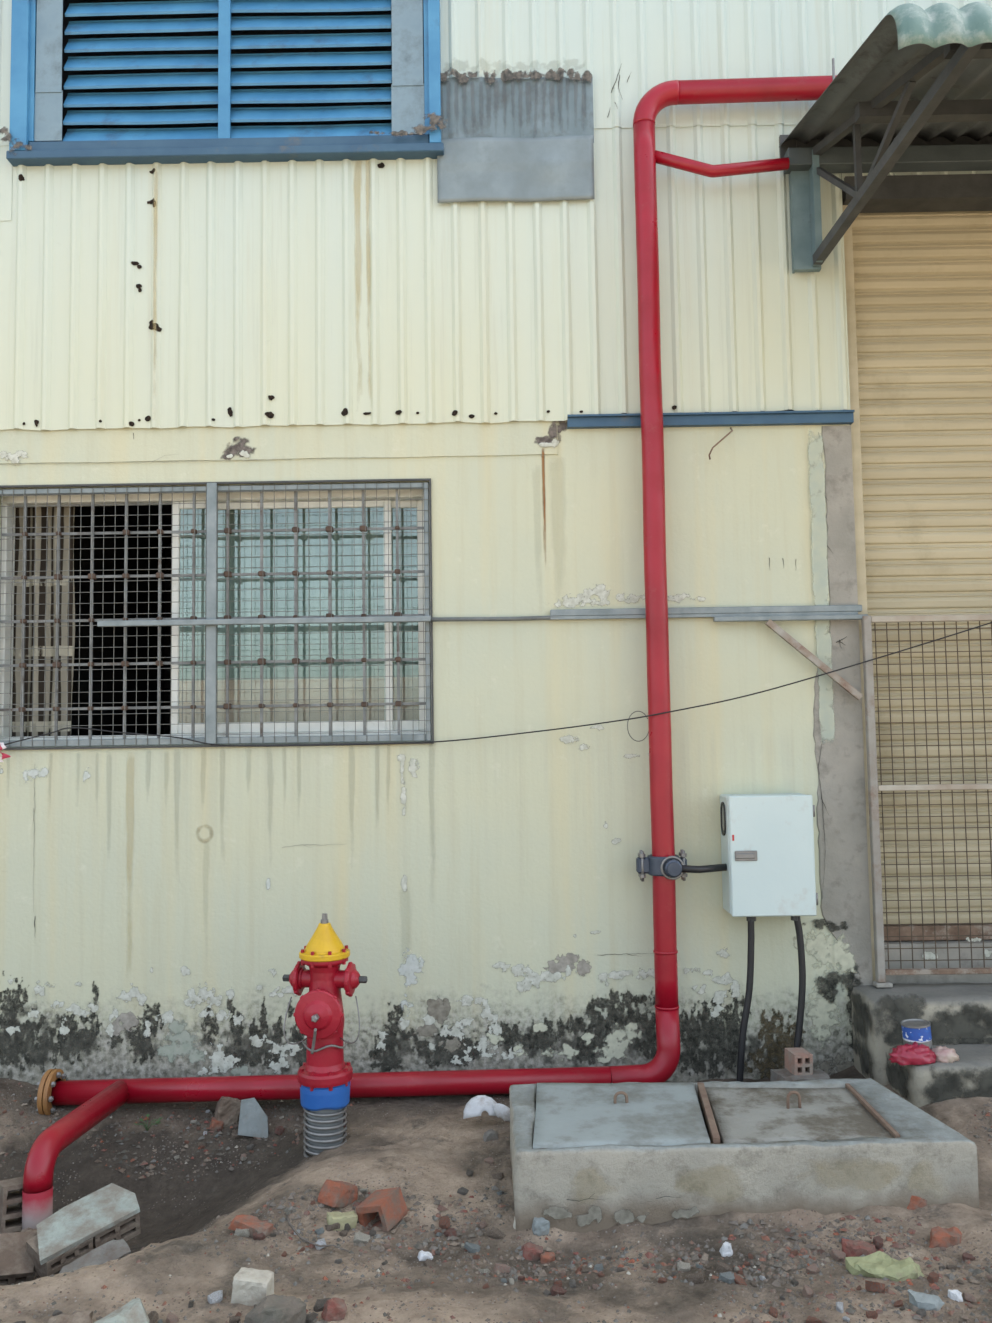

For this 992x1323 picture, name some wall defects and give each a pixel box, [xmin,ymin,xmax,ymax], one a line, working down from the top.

water stain [0,971,164,1075]
water stain [201,998,307,1072]
peeling [376,949,642,1064]
water stain [369,989,657,1072]
water stain [678,990,806,1079]
water stain [814,962,992,1098]
water stain [925,1066,992,1104]